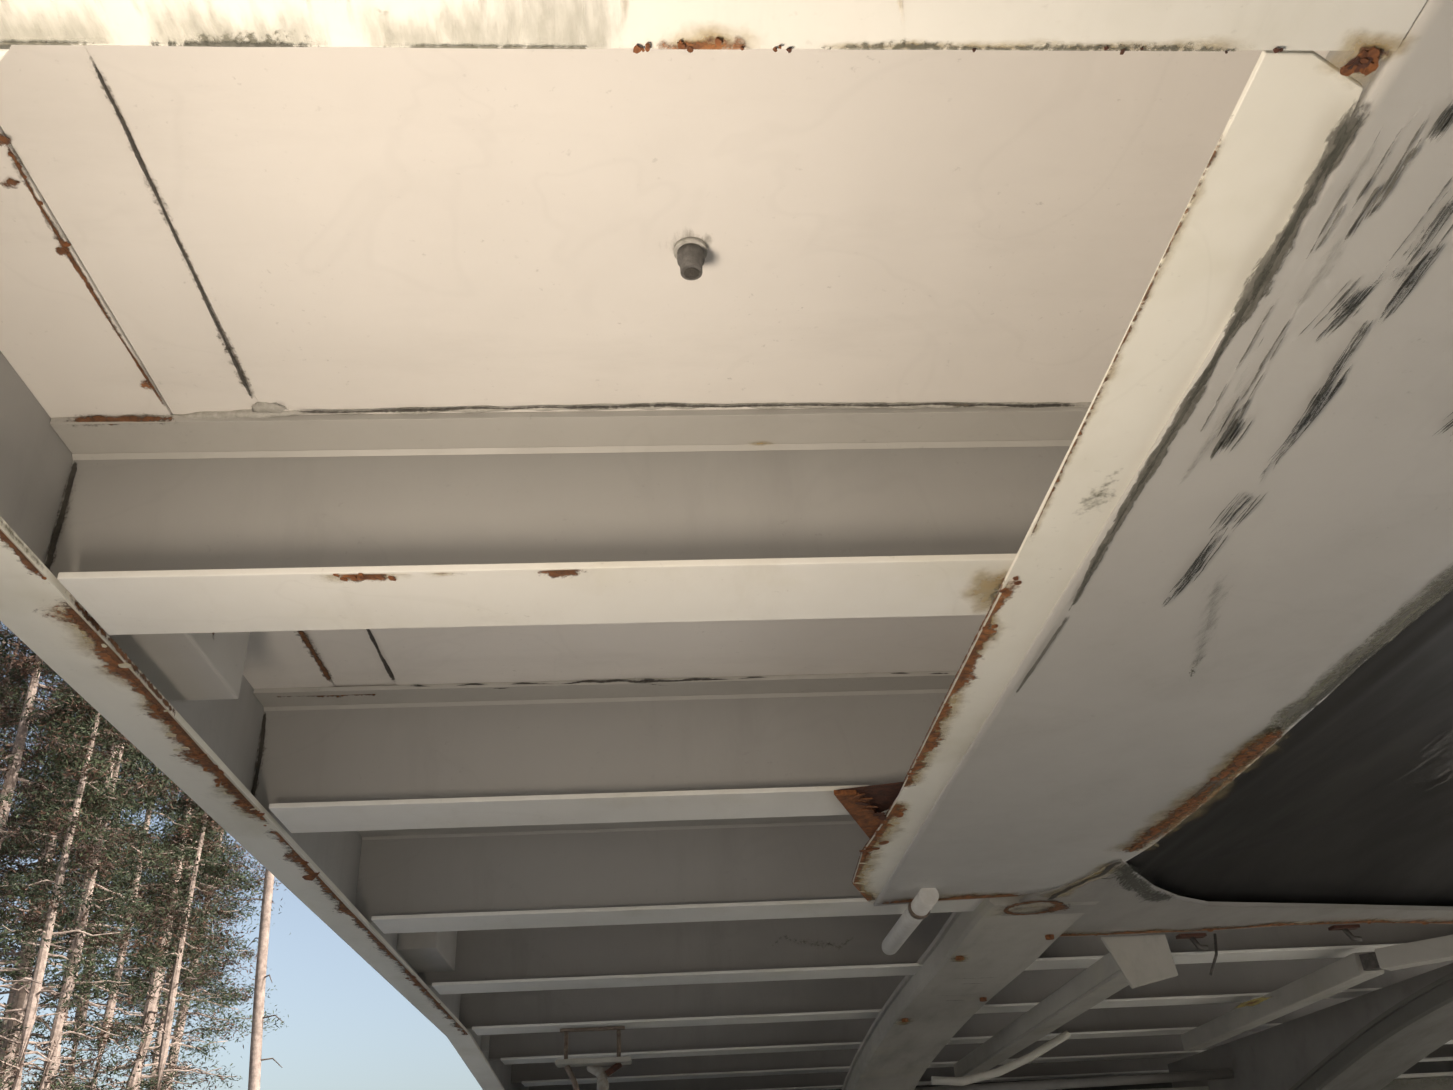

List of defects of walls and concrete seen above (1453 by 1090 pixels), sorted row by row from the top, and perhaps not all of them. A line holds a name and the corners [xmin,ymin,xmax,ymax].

water stain [151,32,307,47]
corrosion [633,34,744,54]
corrosion [821,40,1235,55]
corrosion [1338,41,1392,76]
water stain [1016,102,1453,692]
corrosion [74,415,172,425]
corrosion [333,573,396,582]
corrosion [538,570,580,578]
corrosion [903,576,1022,787]
corrosion [1123,730,1284,852]
corrosion [36,601,468,1035]
corrosion [852,803,913,904]